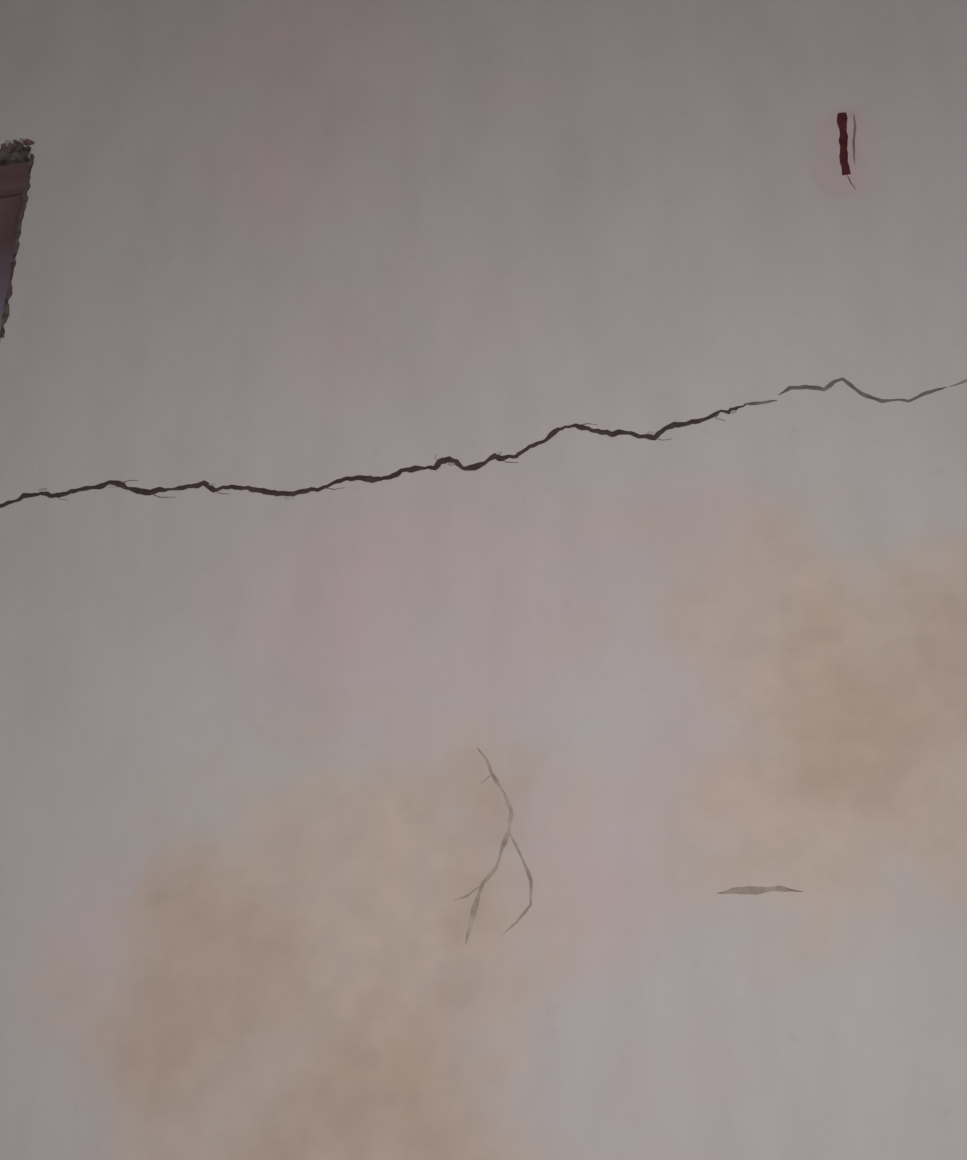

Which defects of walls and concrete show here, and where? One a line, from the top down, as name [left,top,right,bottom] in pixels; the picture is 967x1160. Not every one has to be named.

spalling [0,138,35,338]
rust [803,101,876,206]
crack [0,377,967,508]
leakage [0,431,967,1160]
crack [453,748,533,945]